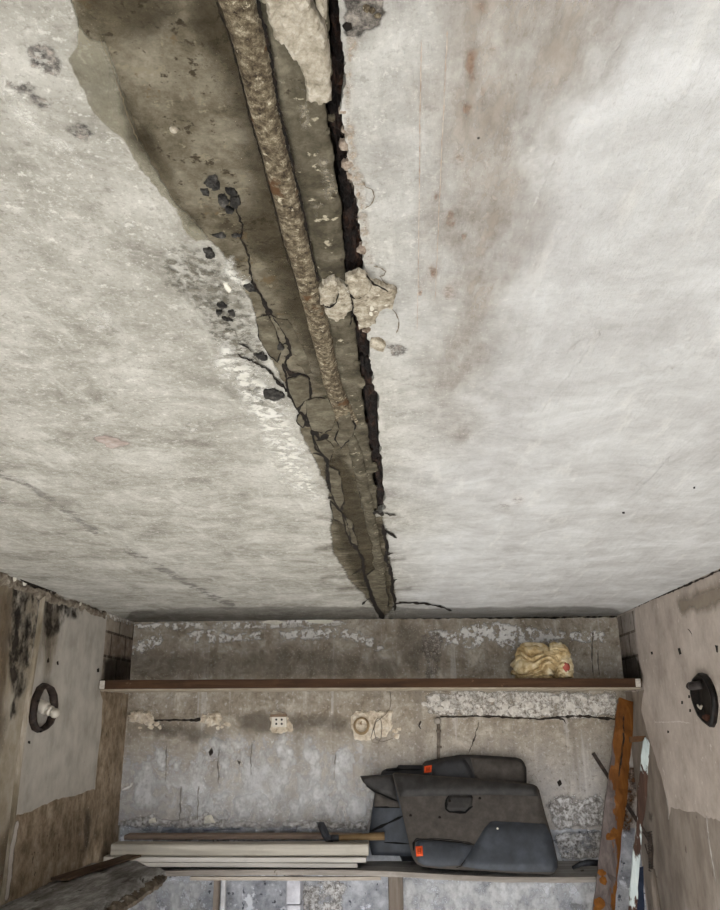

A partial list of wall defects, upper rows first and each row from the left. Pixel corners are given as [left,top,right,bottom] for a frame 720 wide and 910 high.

peeling [265,0,332,105]
spalling [342,0,386,61]
rust [333,99,345,157]
peeling [216,281,235,322]
damp [69,0,395,614]
peeling [318,267,406,356]
peeling [253,315,358,547]
crack [229,200,720,675]
damp [0,589,77,735]
crack [153,717,201,725]
crack [418,714,615,752]
spalling [422,691,617,719]